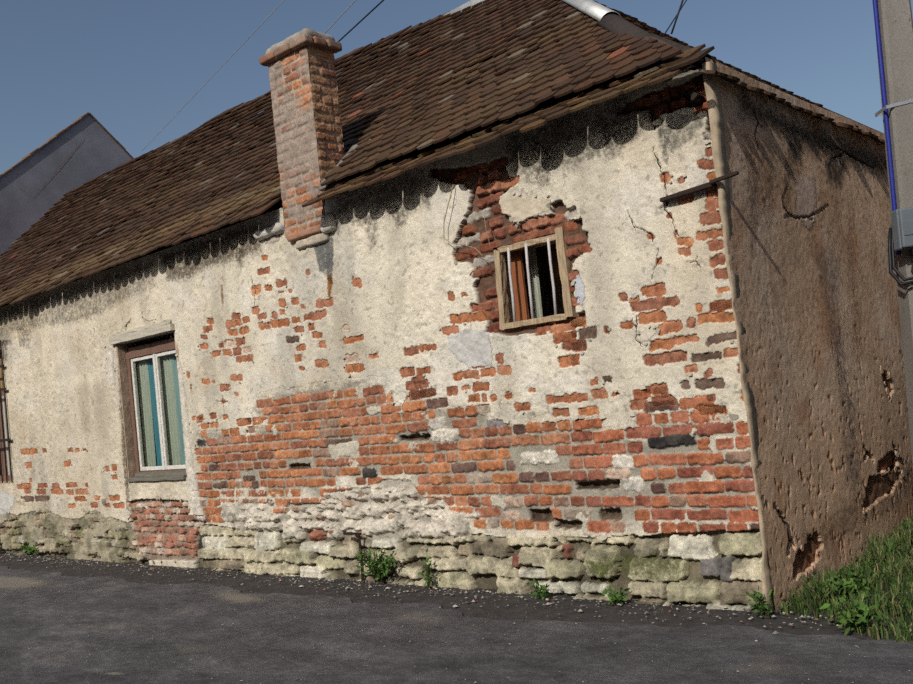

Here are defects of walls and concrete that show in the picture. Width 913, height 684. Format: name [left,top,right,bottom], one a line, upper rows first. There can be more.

spalling [620,67,708,128]
leakage [738,96,888,210]
crack [653,148,678,235]
crack [782,187,826,219]
spalling [0,129,760,563]
spalling [862,450,905,514]
spalling [793,532,821,579]